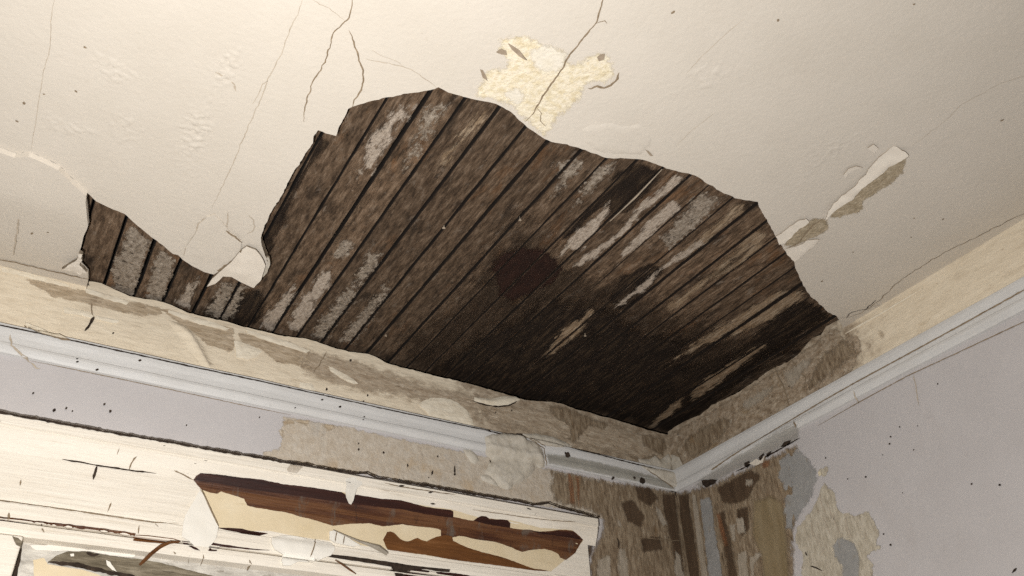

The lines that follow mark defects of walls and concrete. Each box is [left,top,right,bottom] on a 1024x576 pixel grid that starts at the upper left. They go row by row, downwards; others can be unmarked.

crack [212,0,432,207]
peeling [496,43,526,60]
crack [526,0,606,126]
peeling [183,213,270,288]
damp [203,252,390,344]
damp [436,158,828,459]
peeling [776,144,909,262]
peeling [1,250,921,576]